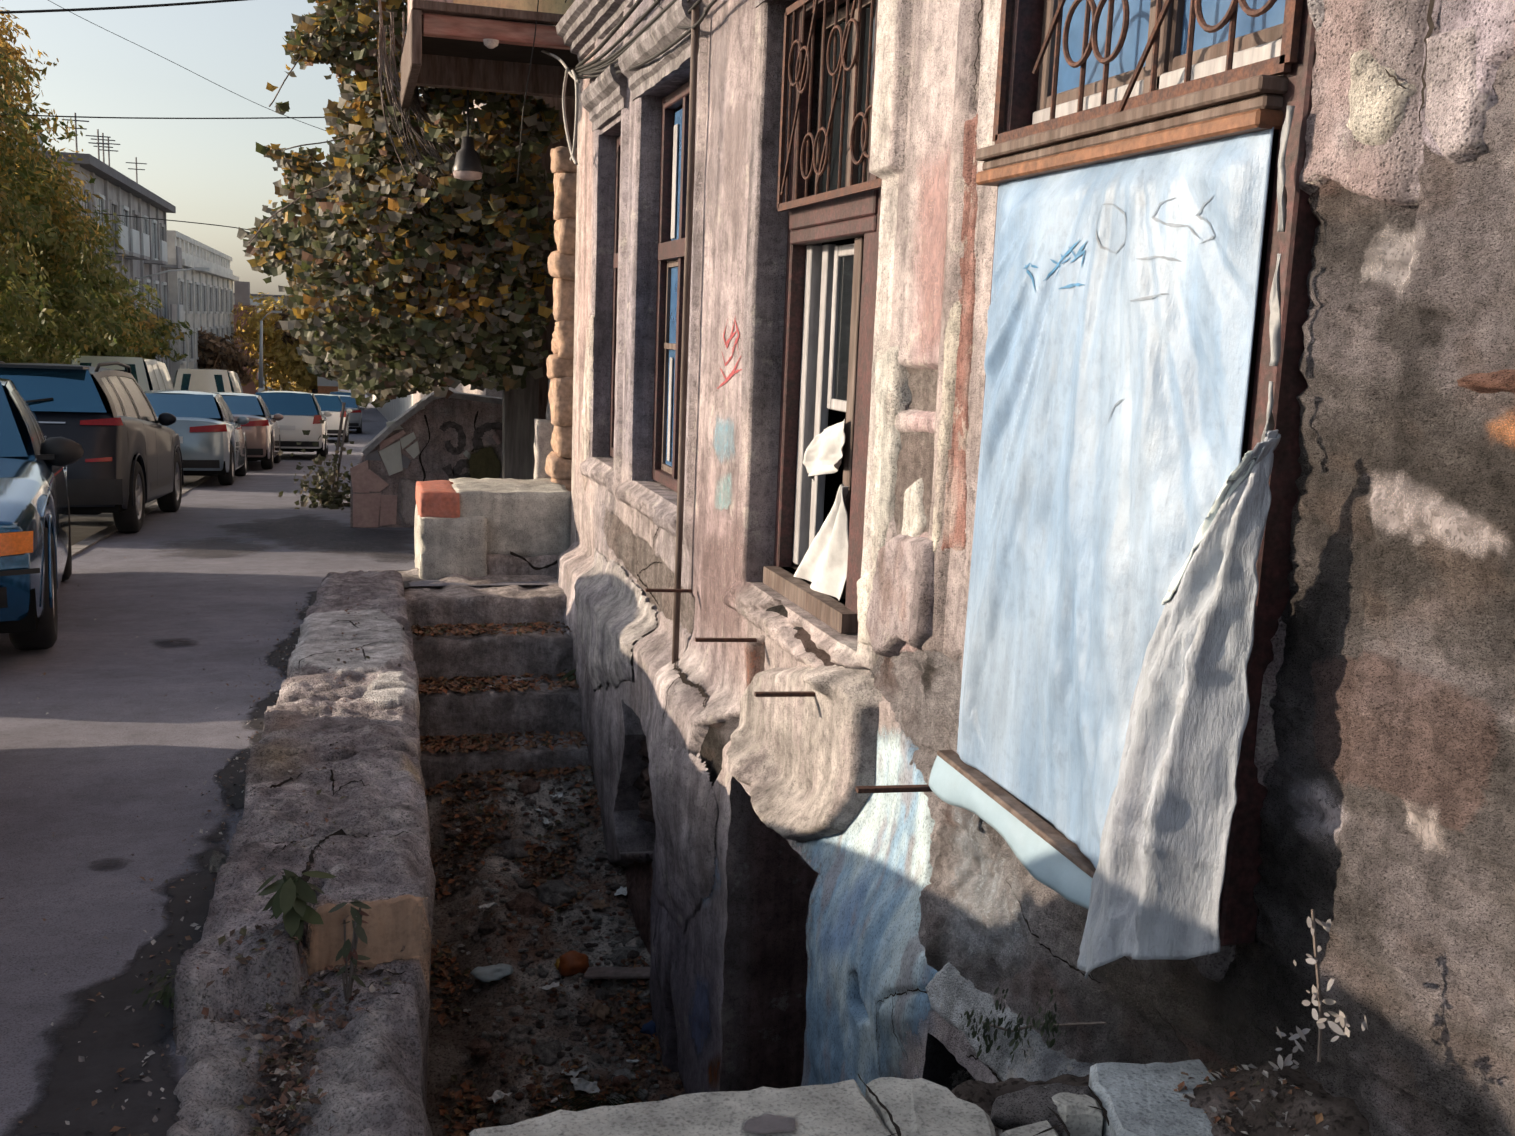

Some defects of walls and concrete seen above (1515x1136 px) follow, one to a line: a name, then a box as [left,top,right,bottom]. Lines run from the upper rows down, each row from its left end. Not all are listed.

crack [1385,0,1435,121]
spalling [604,506,695,635]
spalling [700,26,1515,1136]
crack [249,770,421,882]
spalling [622,860,653,955]
crack [858,988,927,1136]